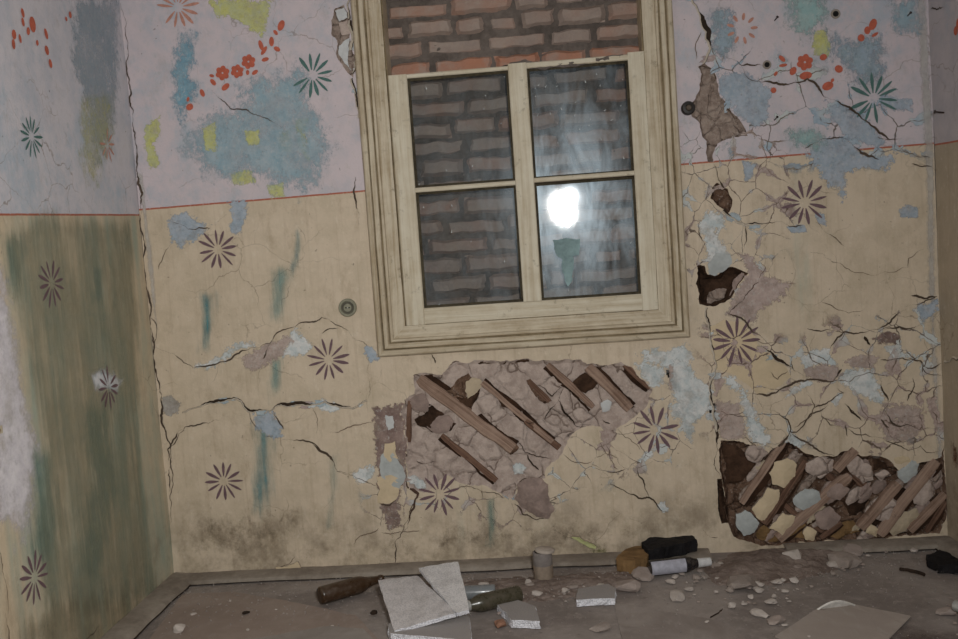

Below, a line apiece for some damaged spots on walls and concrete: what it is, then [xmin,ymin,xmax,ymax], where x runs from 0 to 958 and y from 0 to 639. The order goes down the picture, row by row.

flaking render [691,64,772,162]
crack [680,0,933,277]
crack [122,0,691,562]
flaking render [353,343,712,534]
peeling [696,183,794,322]
crack [701,288,958,477]
flaking render [717,375,947,546]
peeling [800,331,909,406]